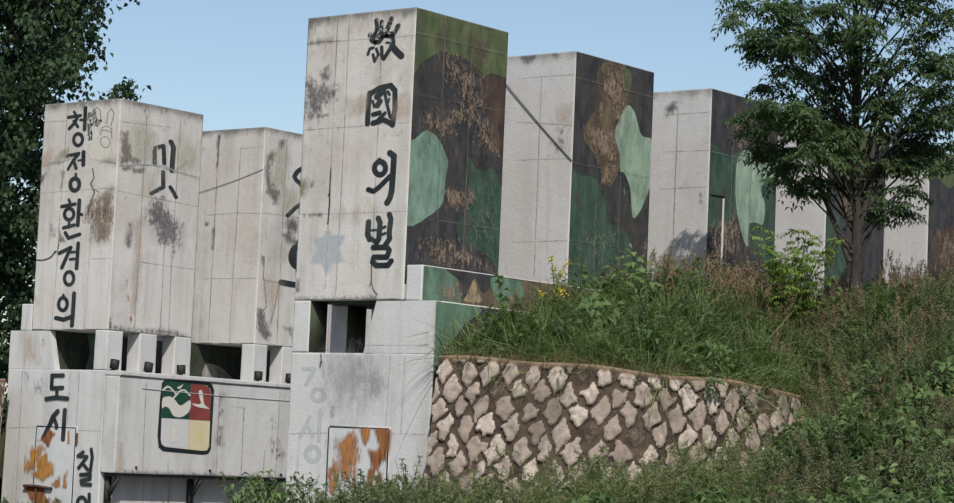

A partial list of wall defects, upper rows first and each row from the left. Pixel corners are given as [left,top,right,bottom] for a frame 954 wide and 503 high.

corrosion [24,429,66,503]
corrosion [327,428,391,495]